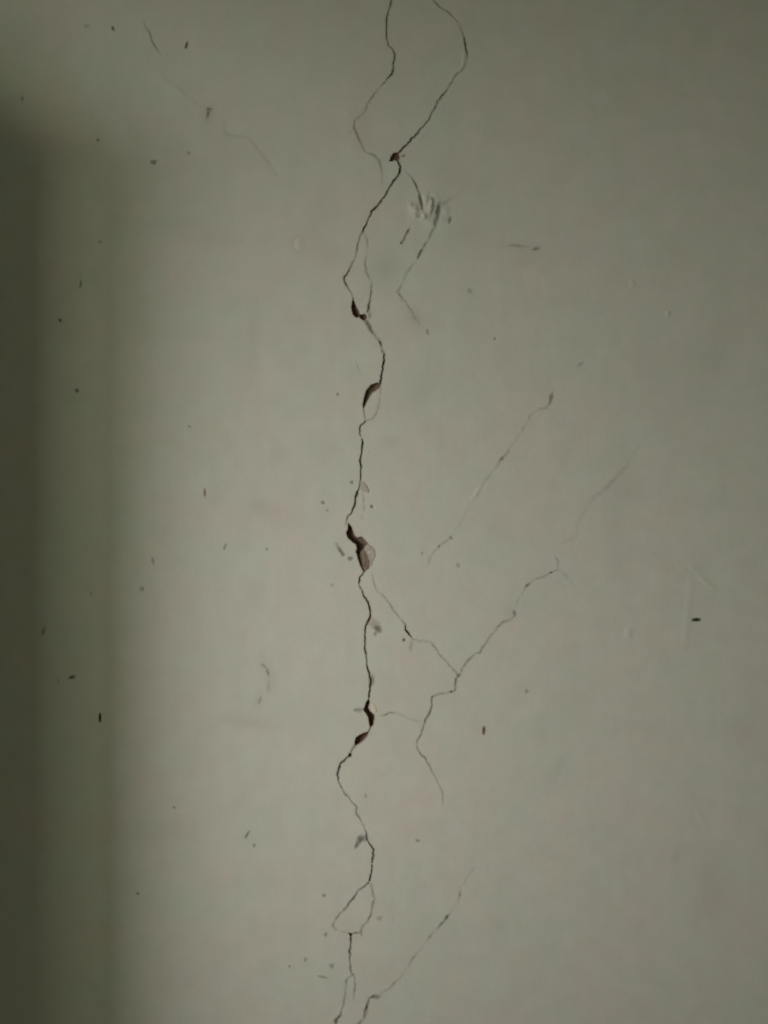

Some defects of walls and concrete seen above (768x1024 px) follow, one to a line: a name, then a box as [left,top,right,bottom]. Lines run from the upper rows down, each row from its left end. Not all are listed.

crack [386,0,395,80]
crack [362,38,467,232]
crack [367,294,385,383]
crack [347,422,365,518]
crack [358,573,372,697]